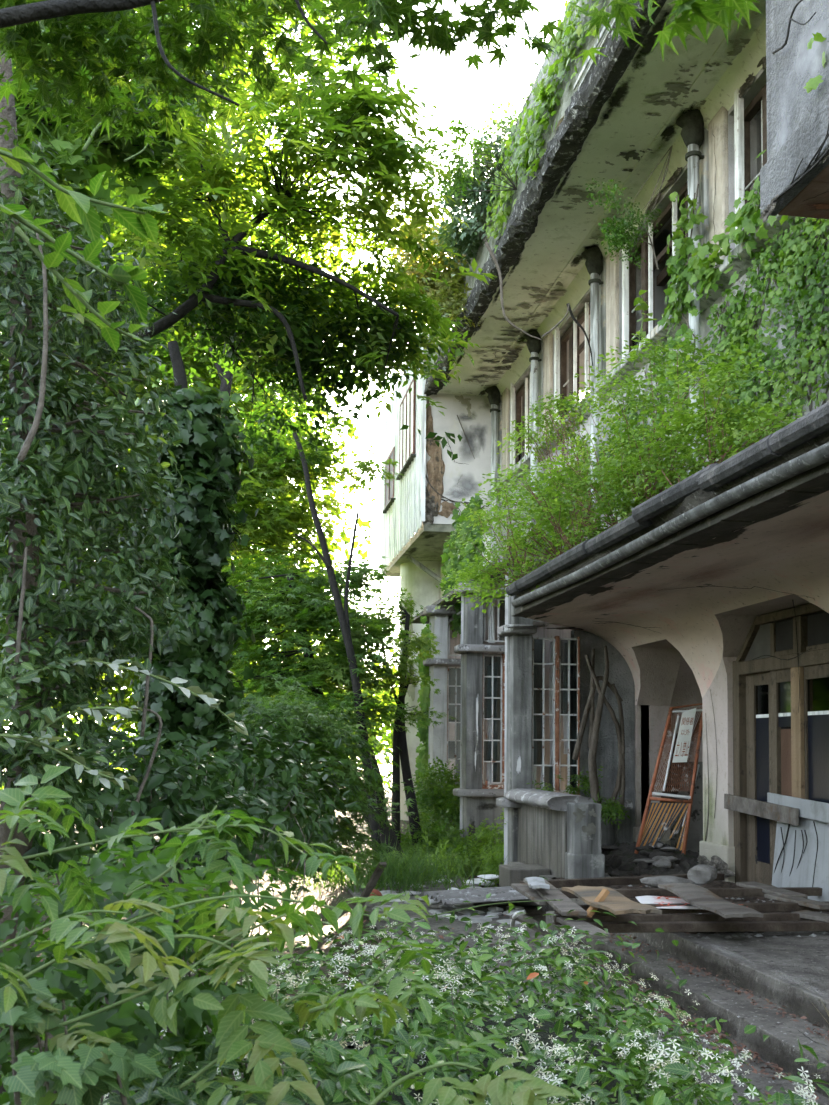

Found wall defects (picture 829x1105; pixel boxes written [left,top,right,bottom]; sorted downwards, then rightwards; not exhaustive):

damp [634,10,671,69]
damp [599,82,628,126]
damp [655,125,676,152]
damp [461,414,484,456]
spalling [420,401,459,524]
damp [450,479,475,498]
damp [688,504,801,550]
damp [507,555,674,630]